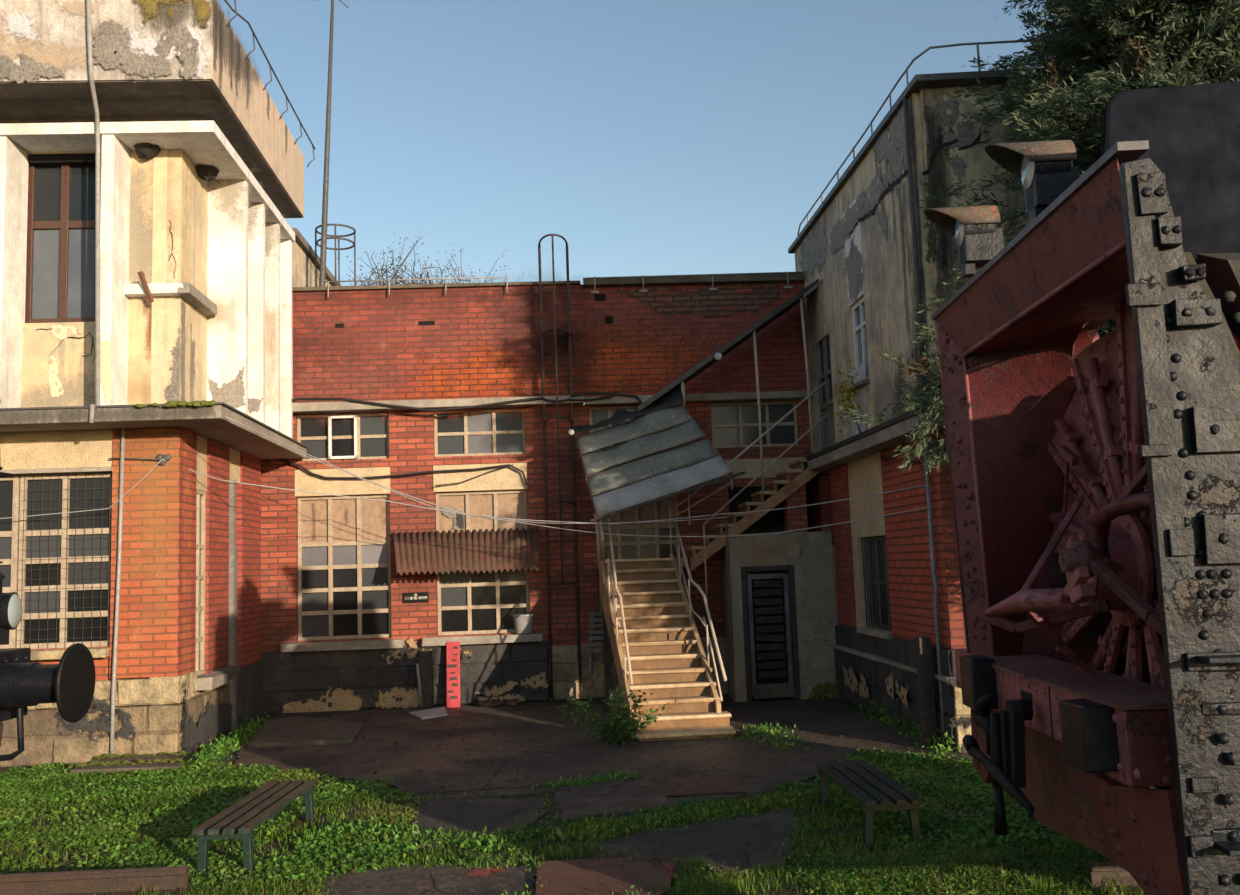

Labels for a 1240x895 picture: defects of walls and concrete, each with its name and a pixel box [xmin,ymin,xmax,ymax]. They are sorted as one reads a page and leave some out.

flaking render [0,0,208,83]
flaking render [933,85,1010,199]
flaking render [799,105,907,303]
crack [168,220,176,279]
damp [875,98,964,416]
spalling [595,283,780,318]
peeling [51,324,83,340]
peeling [48,356,64,397]
peeling [281,686,419,713]
peeling [474,672,549,702]
peeling [842,666,870,698]
peeling [886,673,909,707]